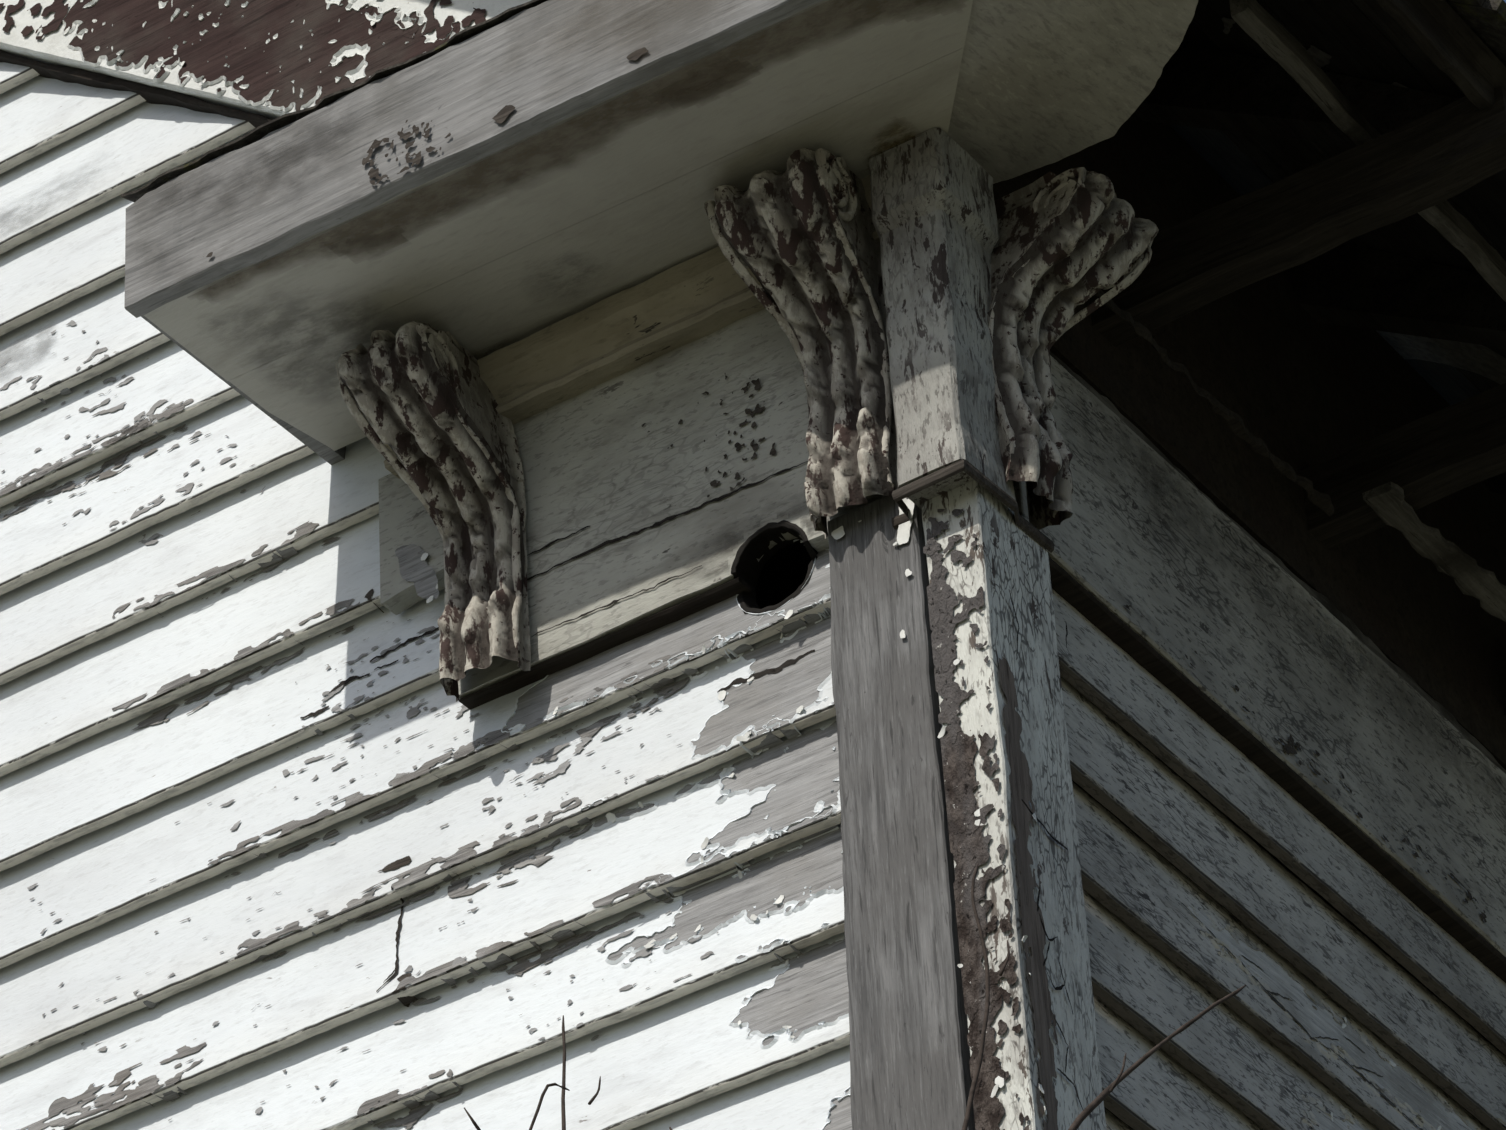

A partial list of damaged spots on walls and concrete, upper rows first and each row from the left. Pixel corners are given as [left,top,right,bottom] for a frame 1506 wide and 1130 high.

peeling [0,0,486,112]
peeling [112,520,861,1024]
peeling [893,498,1058,1130]
peeling [96,990,160,1010]
crack [376,886,404,992]
peeling [521,974,599,1041]
peeling [729,922,849,1049]
spalling [18,1021,219,1130]
spalling [357,1069,463,1129]